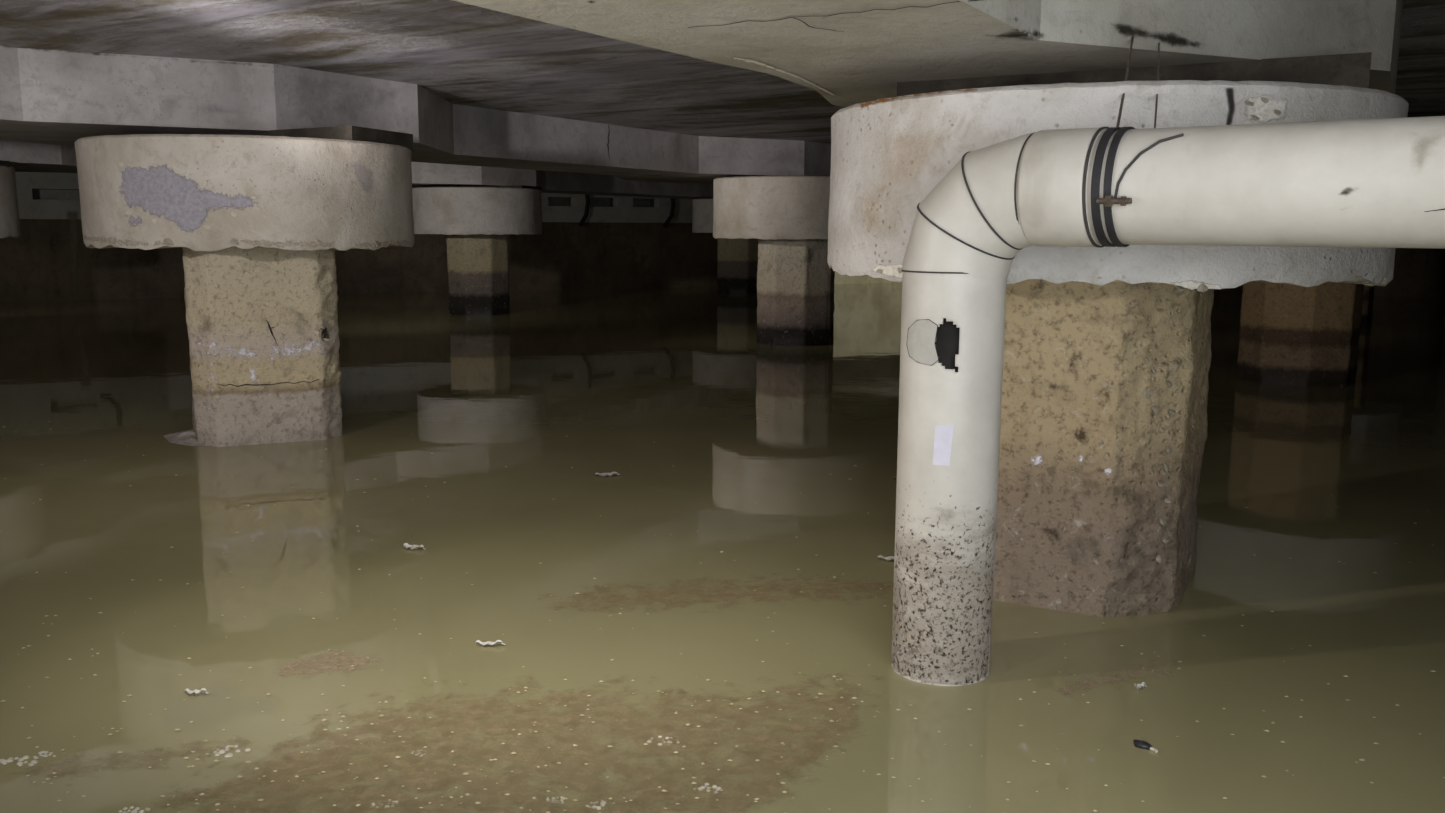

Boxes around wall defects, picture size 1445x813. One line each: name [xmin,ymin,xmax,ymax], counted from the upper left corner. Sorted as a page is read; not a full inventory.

crack [687,0,979,32]
peeling [115,162,261,232]